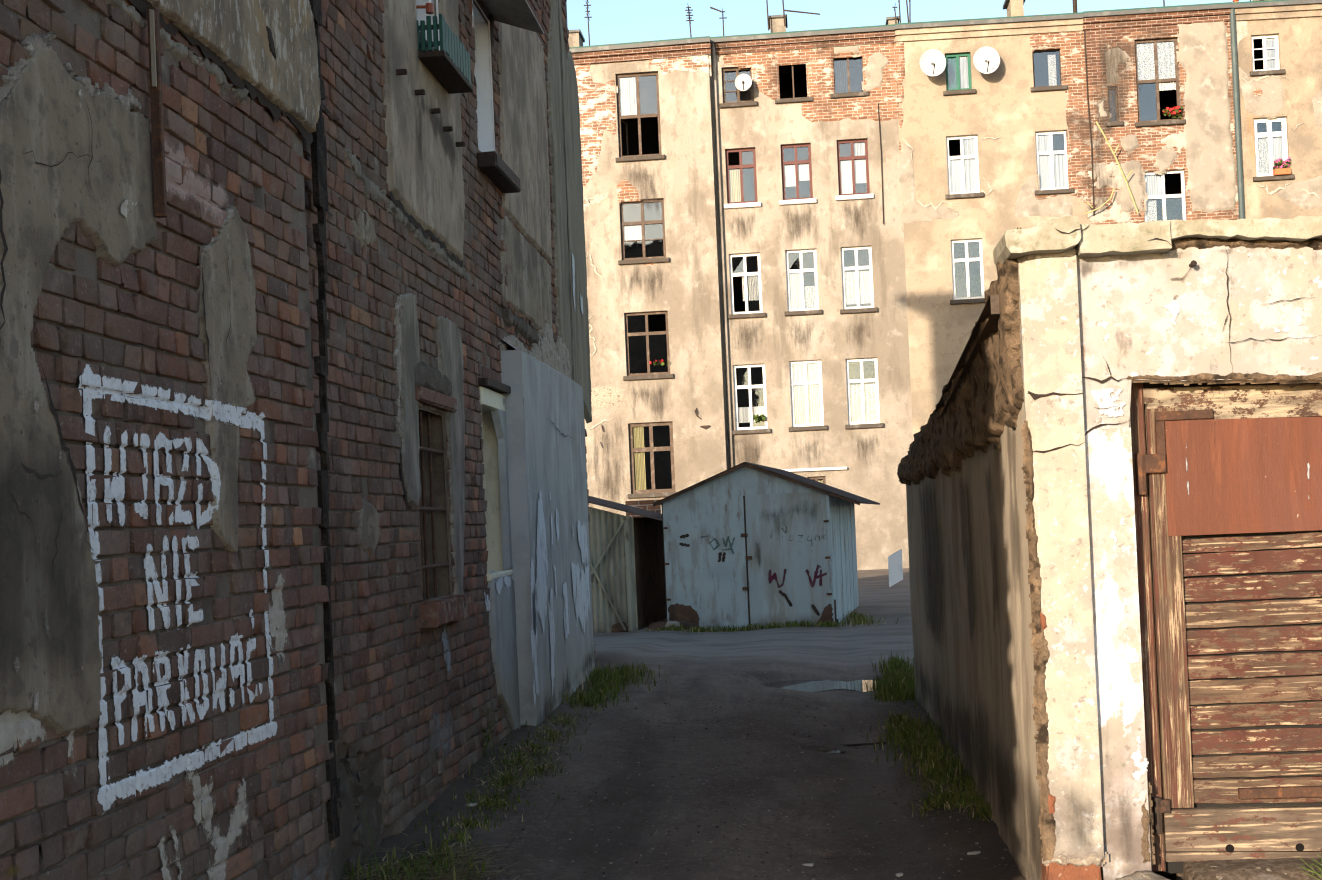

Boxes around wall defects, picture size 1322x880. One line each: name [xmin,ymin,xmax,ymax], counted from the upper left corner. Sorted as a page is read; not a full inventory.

flaking render [0,31,157,735]
flaking render [105,0,321,145]
flaking render [196,205,258,553]
crack [309,0,340,841]
flaking render [497,0,641,430]
flaking render [648,42,913,163]
flaking render [1015,21,1291,223]
spalling [1091,372,1322,417]
spalling [1170,237,1322,251]
crack [1222,250,1322,371]
flaking render [1257,175,1322,210]
peeling [530,490,591,705]